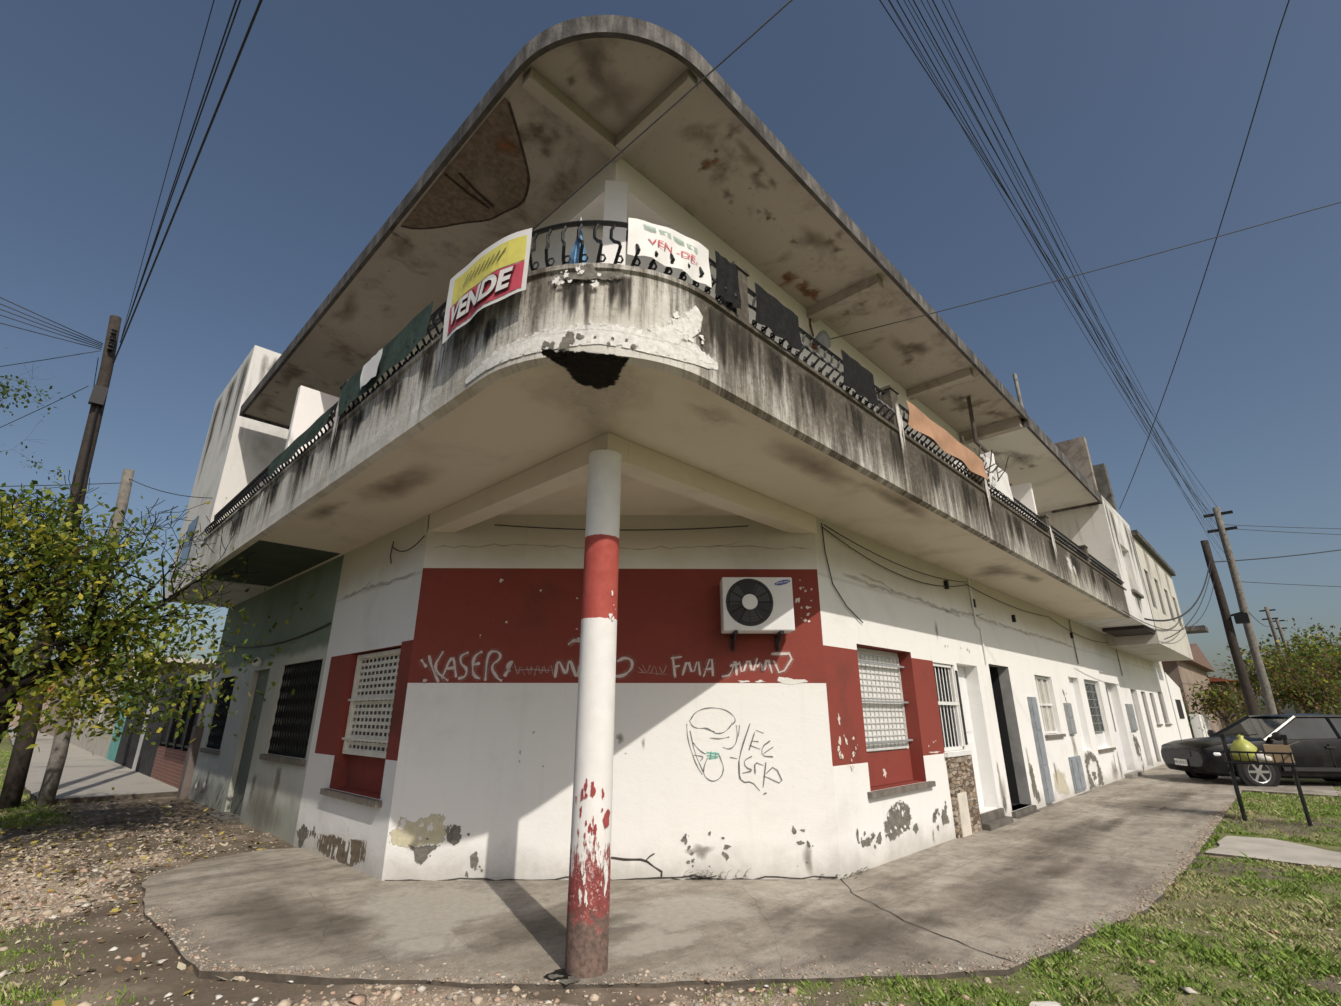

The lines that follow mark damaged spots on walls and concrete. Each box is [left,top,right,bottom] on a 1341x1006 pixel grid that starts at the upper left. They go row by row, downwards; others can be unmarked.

damp [542,279,591,318]
damp [609,276,631,309]
rust [783,274,818,299]
spalling [541,331,637,389]
peeling [648,305,714,365]
damp [329,399,363,462]
damp [891,405,905,466]
damp [1049,526,1111,593]
peeling [297,824,367,867]
peeling [389,813,470,865]
peeling [575,778,610,908]
peeling [856,800,950,849]